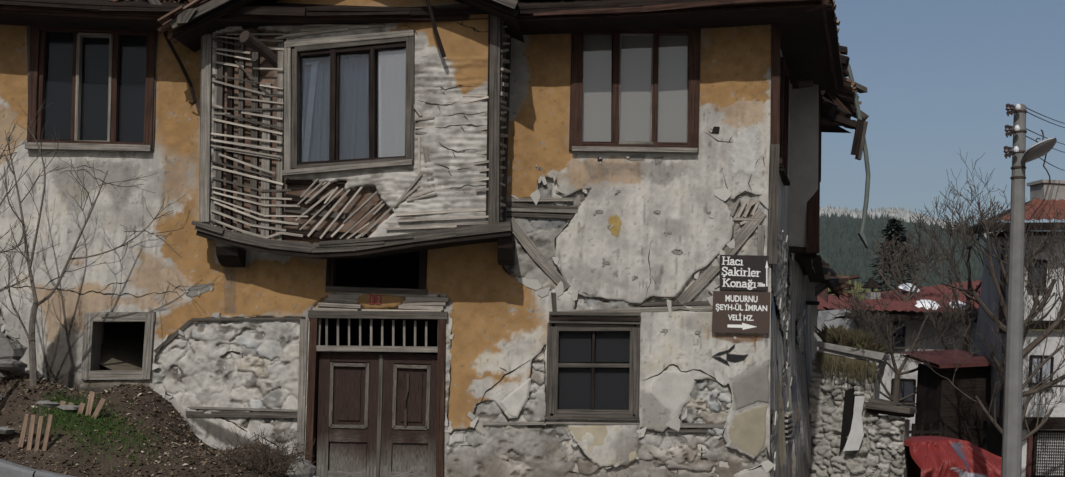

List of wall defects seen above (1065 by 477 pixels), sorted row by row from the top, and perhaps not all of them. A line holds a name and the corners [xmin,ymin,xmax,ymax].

peeling [0,309,20,338]
peeling [444,165,806,477]
peeling [152,312,305,455]
crack [476,360,530,405]
crack [645,364,716,380]